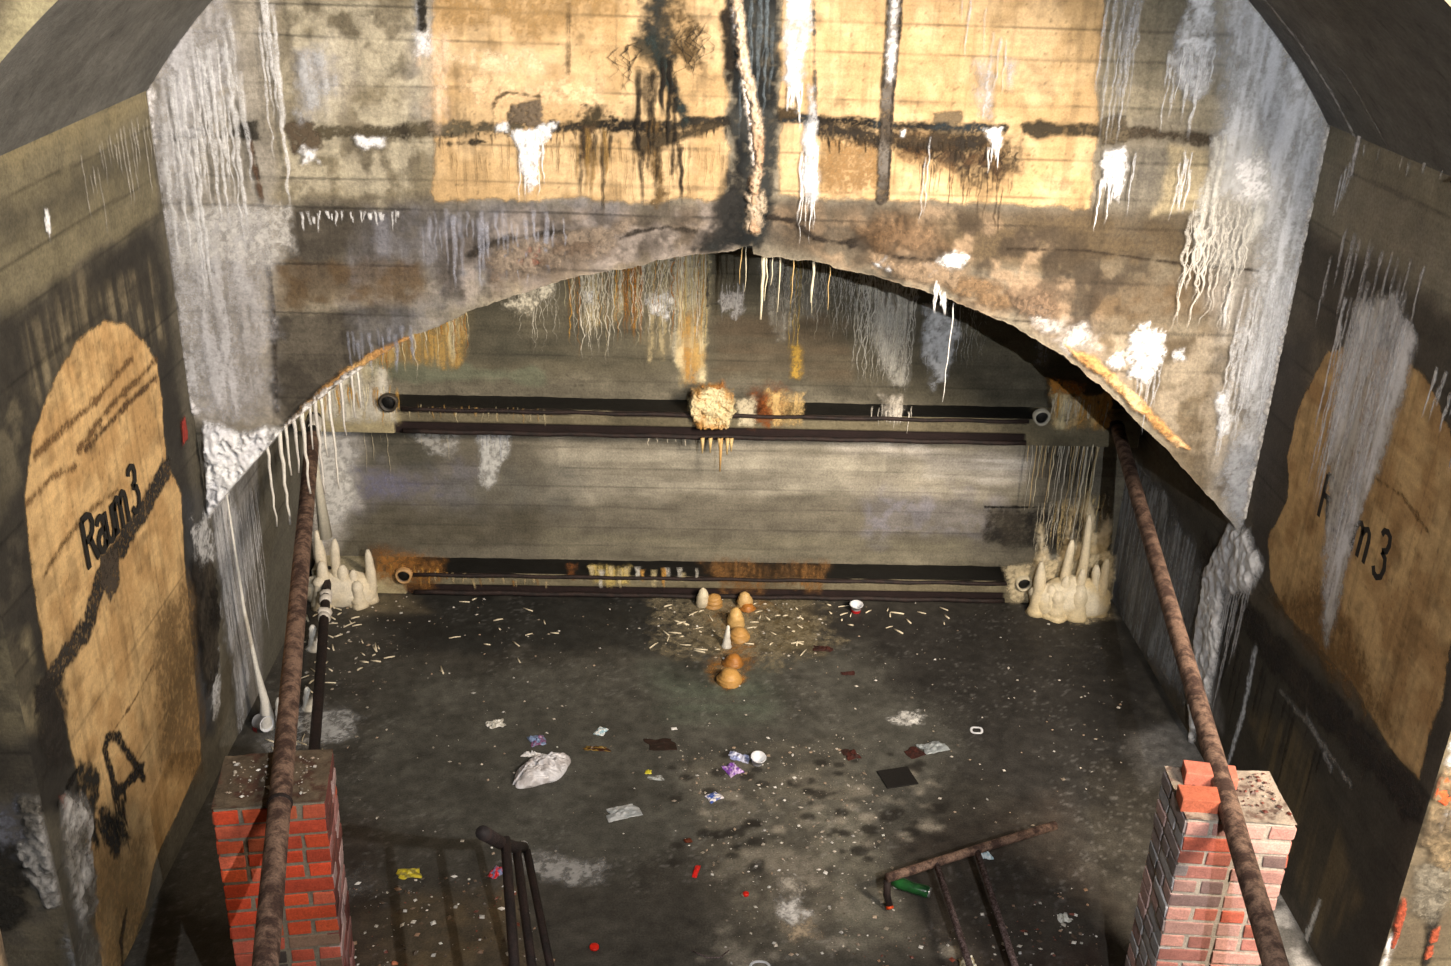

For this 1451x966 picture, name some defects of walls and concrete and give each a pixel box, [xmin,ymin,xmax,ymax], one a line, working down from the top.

efflorescence [146,0,399,416]
water stain [312,312,468,541]
water stain [477,435,511,488]
water stain [570,564,681,586]
water stain [416,0,1017,431]
water stain [1021,0,1364,524]
water stain [1312,232,1424,645]
water stain [1423,370,1450,426]